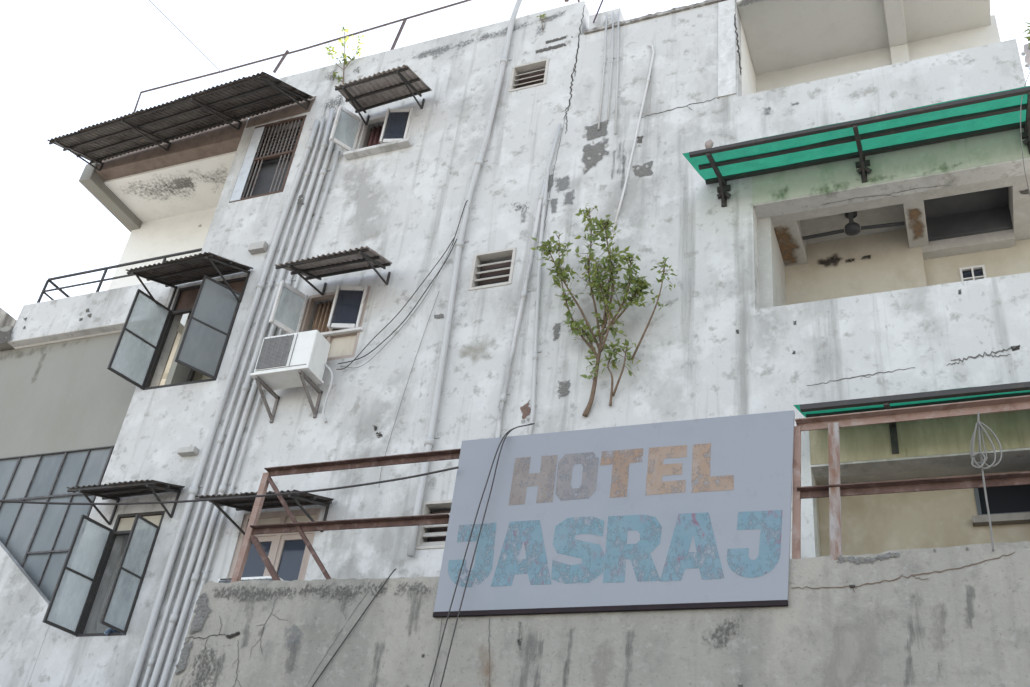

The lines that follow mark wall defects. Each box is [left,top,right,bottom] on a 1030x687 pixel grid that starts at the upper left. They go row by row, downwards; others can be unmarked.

flaking render [582,121,609,174]
damp [128,171,225,199]
damp [214,582,428,601]
crack [795,552,1015,593]
crack [188,589,287,687]
damp [712,622,737,648]
mould [190,648,219,687]